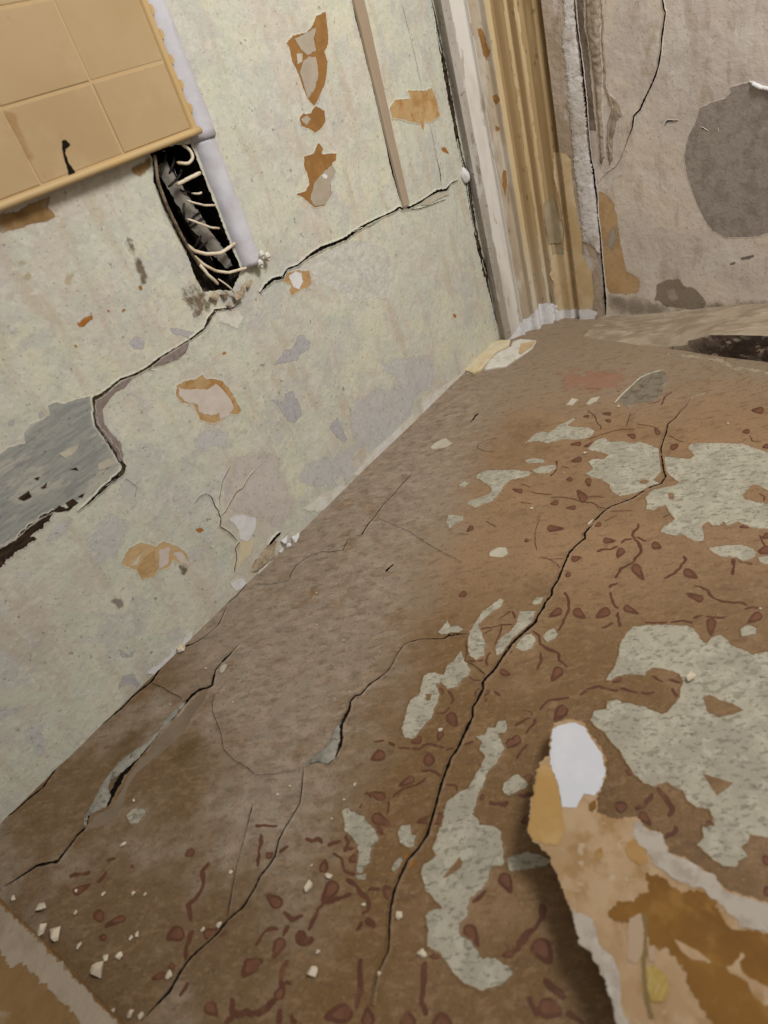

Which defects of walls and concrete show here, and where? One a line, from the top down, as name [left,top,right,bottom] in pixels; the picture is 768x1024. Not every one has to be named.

peeling [285,10,337,209]
crack [574,0,667,315]
peeling [683,81,768,239]
crack [77,0,498,513]
peeling [174,373,243,425]
peeling [18,477,47,501]
peeling [52,494,84,512]
peeling [121,540,191,582]
peeling [125,806,148,826]
crack [1,399,693,1023]
peeling [588,623,768,870]